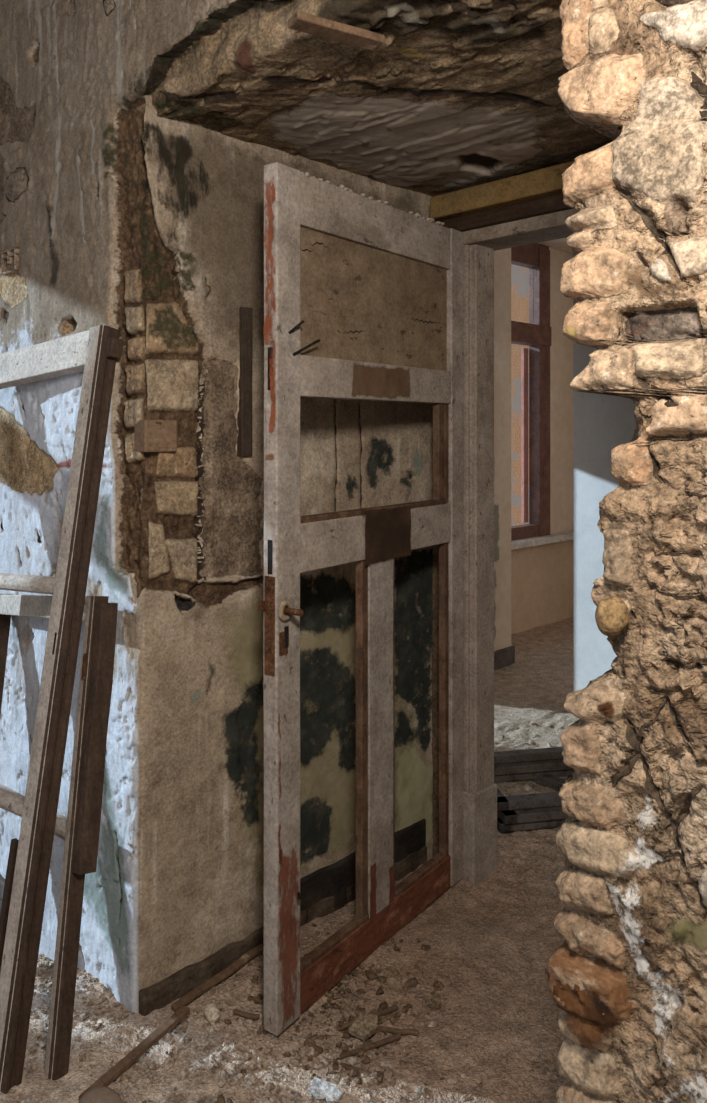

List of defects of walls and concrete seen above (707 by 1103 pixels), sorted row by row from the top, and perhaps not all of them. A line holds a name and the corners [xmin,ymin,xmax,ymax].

water stain [142,96,244,217]
peeling [271,95,543,188]
flaking render [558,0,707,392]
flaking render [113,99,264,612]
peeling [352,364,410,399]
spalling [0,407,71,495]
peeling [346,439,394,499]
flaking render [611,394,707,487]
flaking render [602,528,634,623]
flaking render [554,678,640,982]
water stain [607,795,681,1037]
flaking render [556,1010,624,1103]